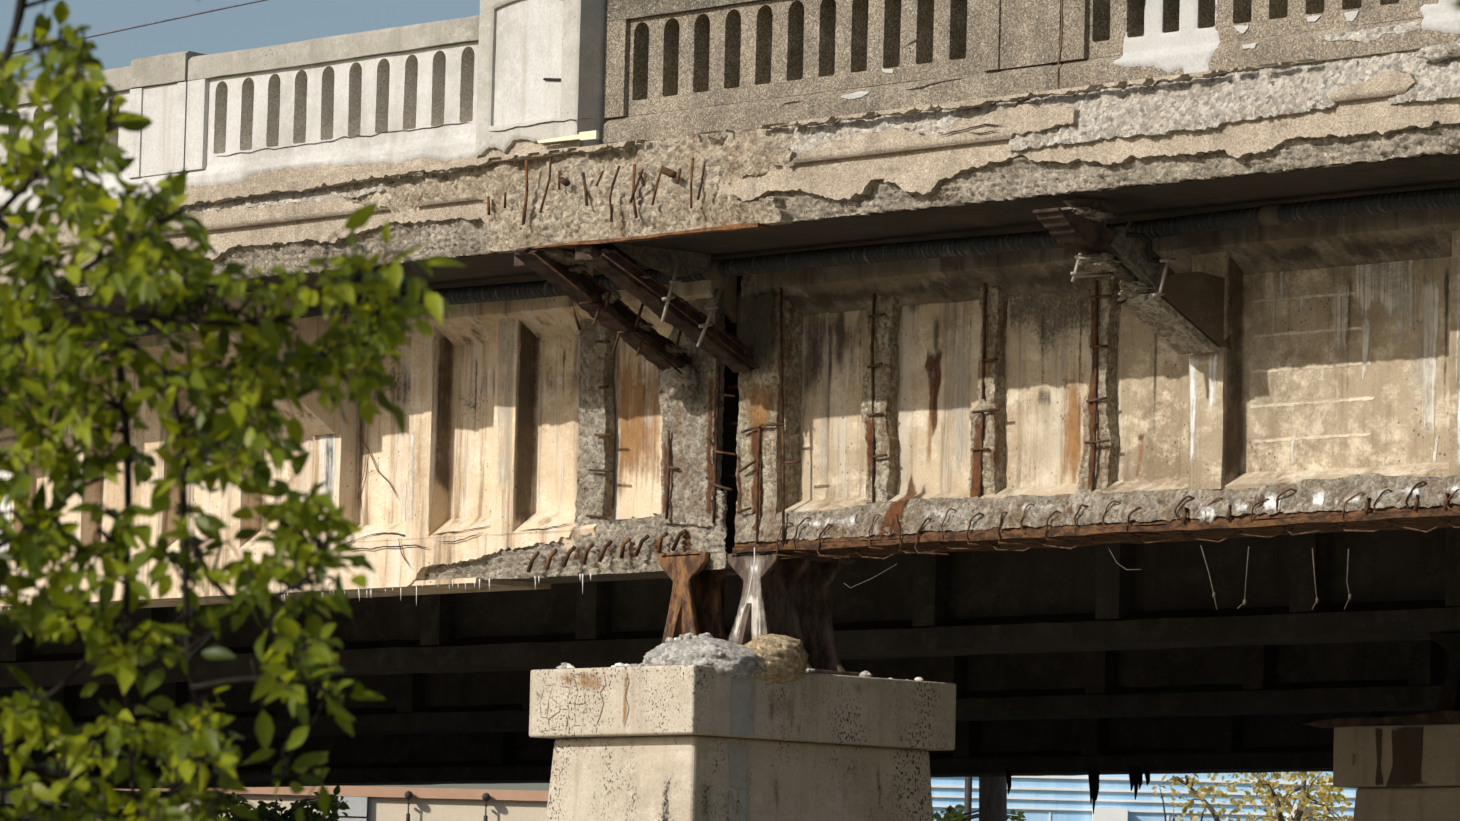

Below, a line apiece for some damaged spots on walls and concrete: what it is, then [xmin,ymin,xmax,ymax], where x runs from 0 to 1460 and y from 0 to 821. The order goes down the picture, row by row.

spalling [177,10,1460,280]
spalling [61,282,96,298]
rust [705,379,713,514]
rust [878,475,917,536]
rust [925,350,941,457]
spalling [424,274,1460,581]
rust [970,420,986,498]
leakage [1237,496,1281,510]
leakage [1190,237,1460,481]
leakage [1313,493,1358,505]